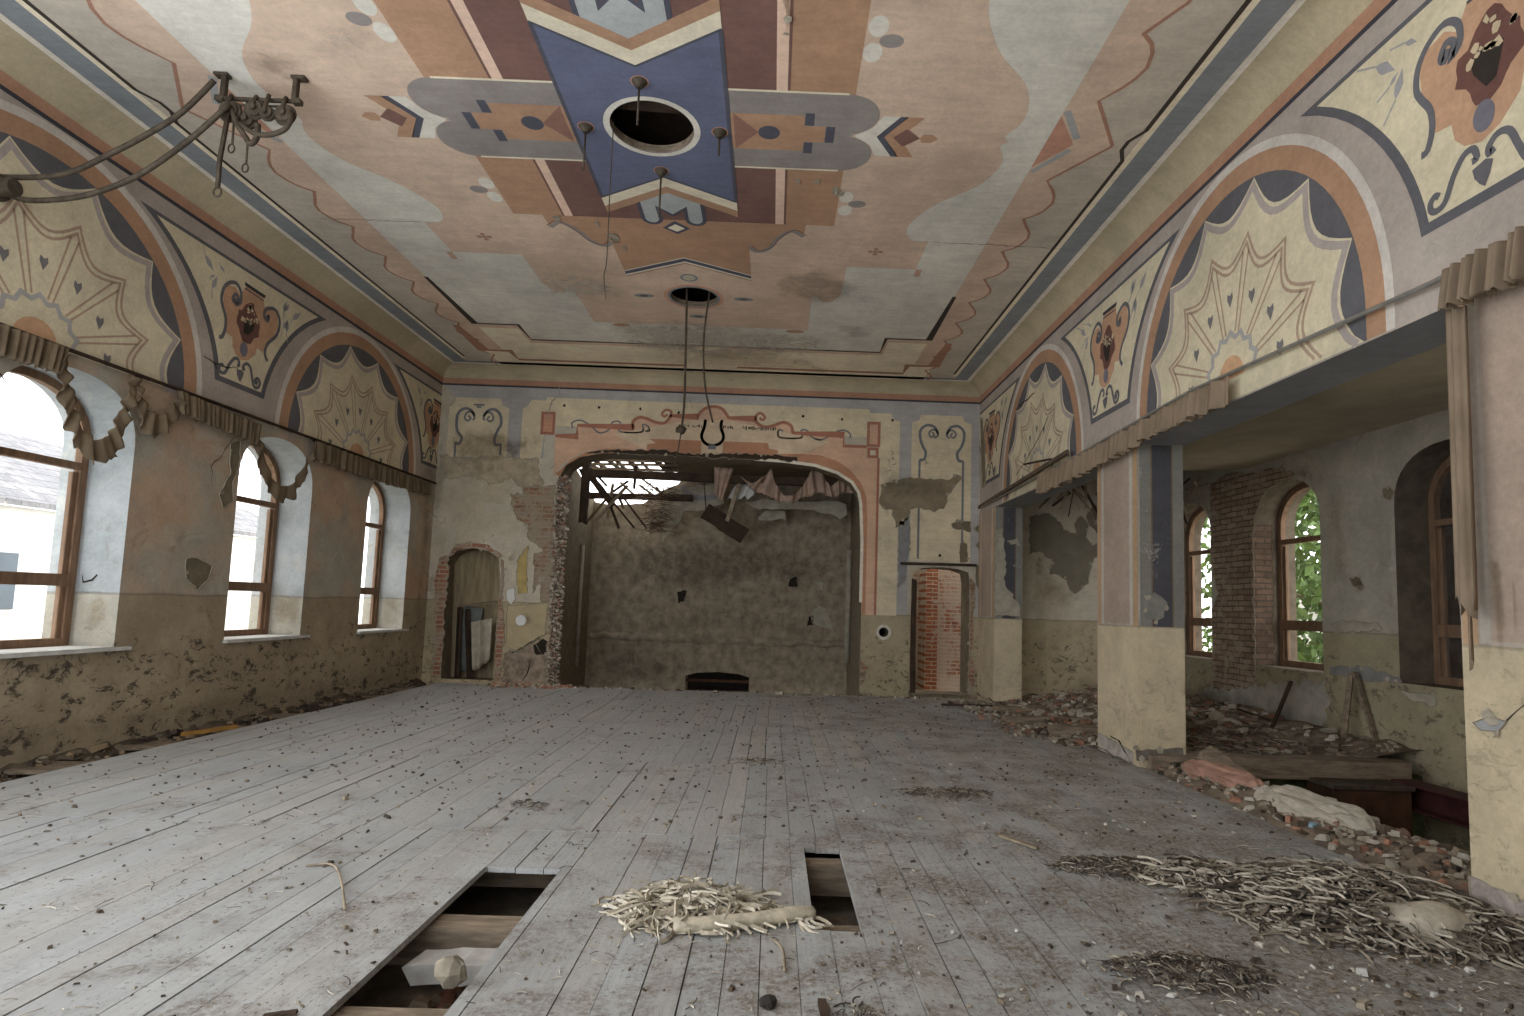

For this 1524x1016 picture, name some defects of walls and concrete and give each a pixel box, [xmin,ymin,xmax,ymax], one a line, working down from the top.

peeling [431,454,557,681]
peeling [879,474,1097,699]